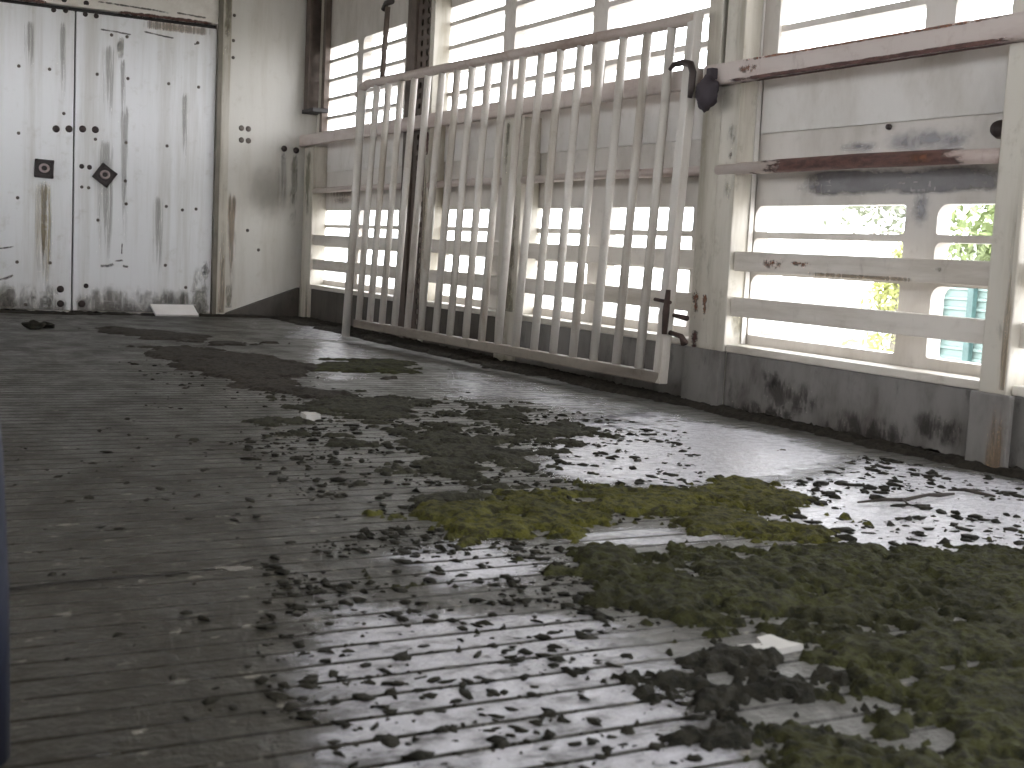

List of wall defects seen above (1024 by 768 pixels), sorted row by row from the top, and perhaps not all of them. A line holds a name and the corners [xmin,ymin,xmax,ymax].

rust [731,16,1015,83]
rust [753,149,962,174]
rust [692,292,707,314]